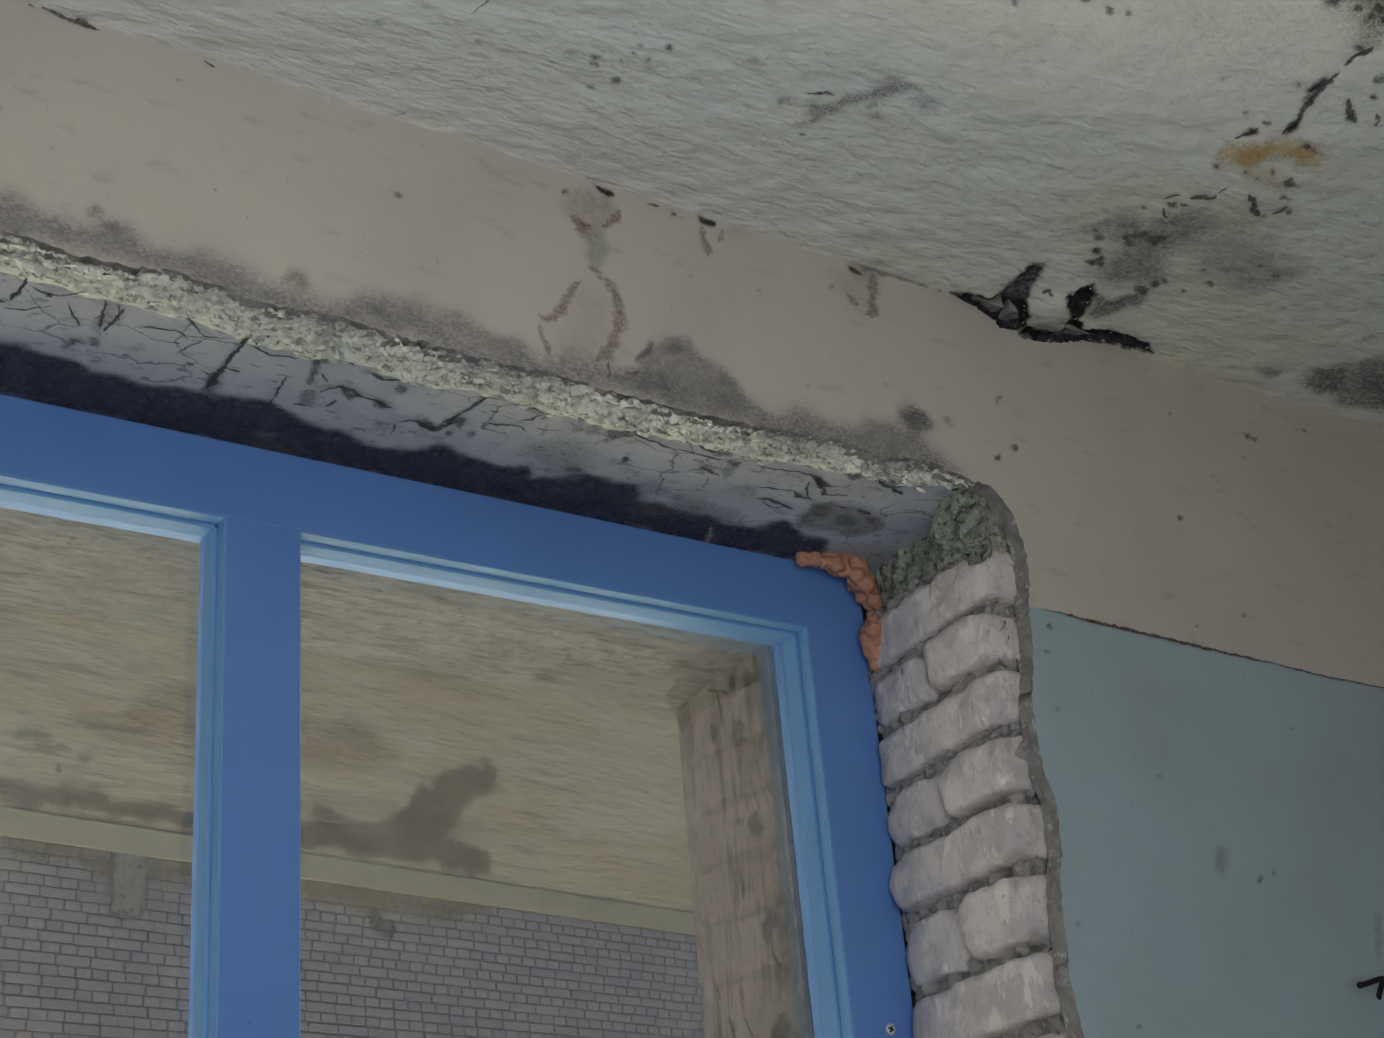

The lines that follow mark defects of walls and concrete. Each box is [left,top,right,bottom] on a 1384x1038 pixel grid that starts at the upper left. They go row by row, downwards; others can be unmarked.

crack [0,278,296,404]
crack [320,373,561,434]
crack [950,263,1154,354]
leakage [1313,359,1384,409]
crack [676,448,908,516]
flaking render [0,234,1068,1038]